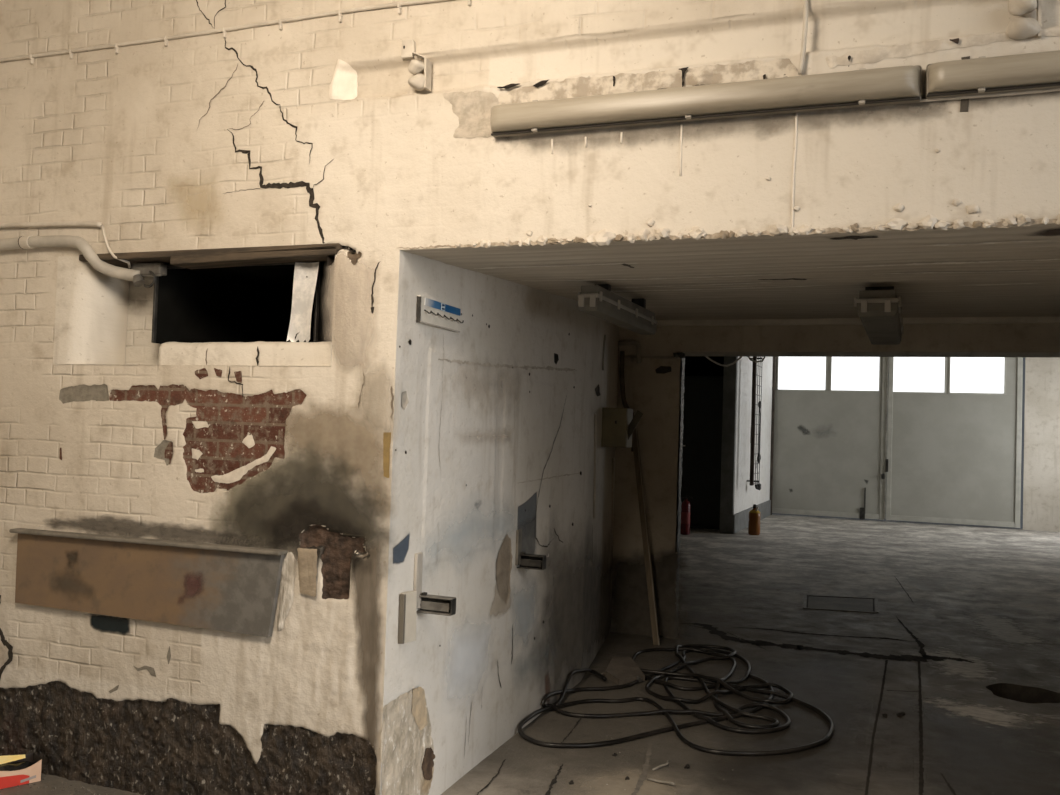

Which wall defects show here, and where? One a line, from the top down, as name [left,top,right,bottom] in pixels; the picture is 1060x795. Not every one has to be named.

crack [196,0,331,244]
spalling [443,58,800,138]
peeling [59,368,307,493]
peeling [0,636,8,668]
crack [0,628,13,679]
flaking render [277,525,366,631]
crack [685,578,975,663]
spalling [0,681,435,795]